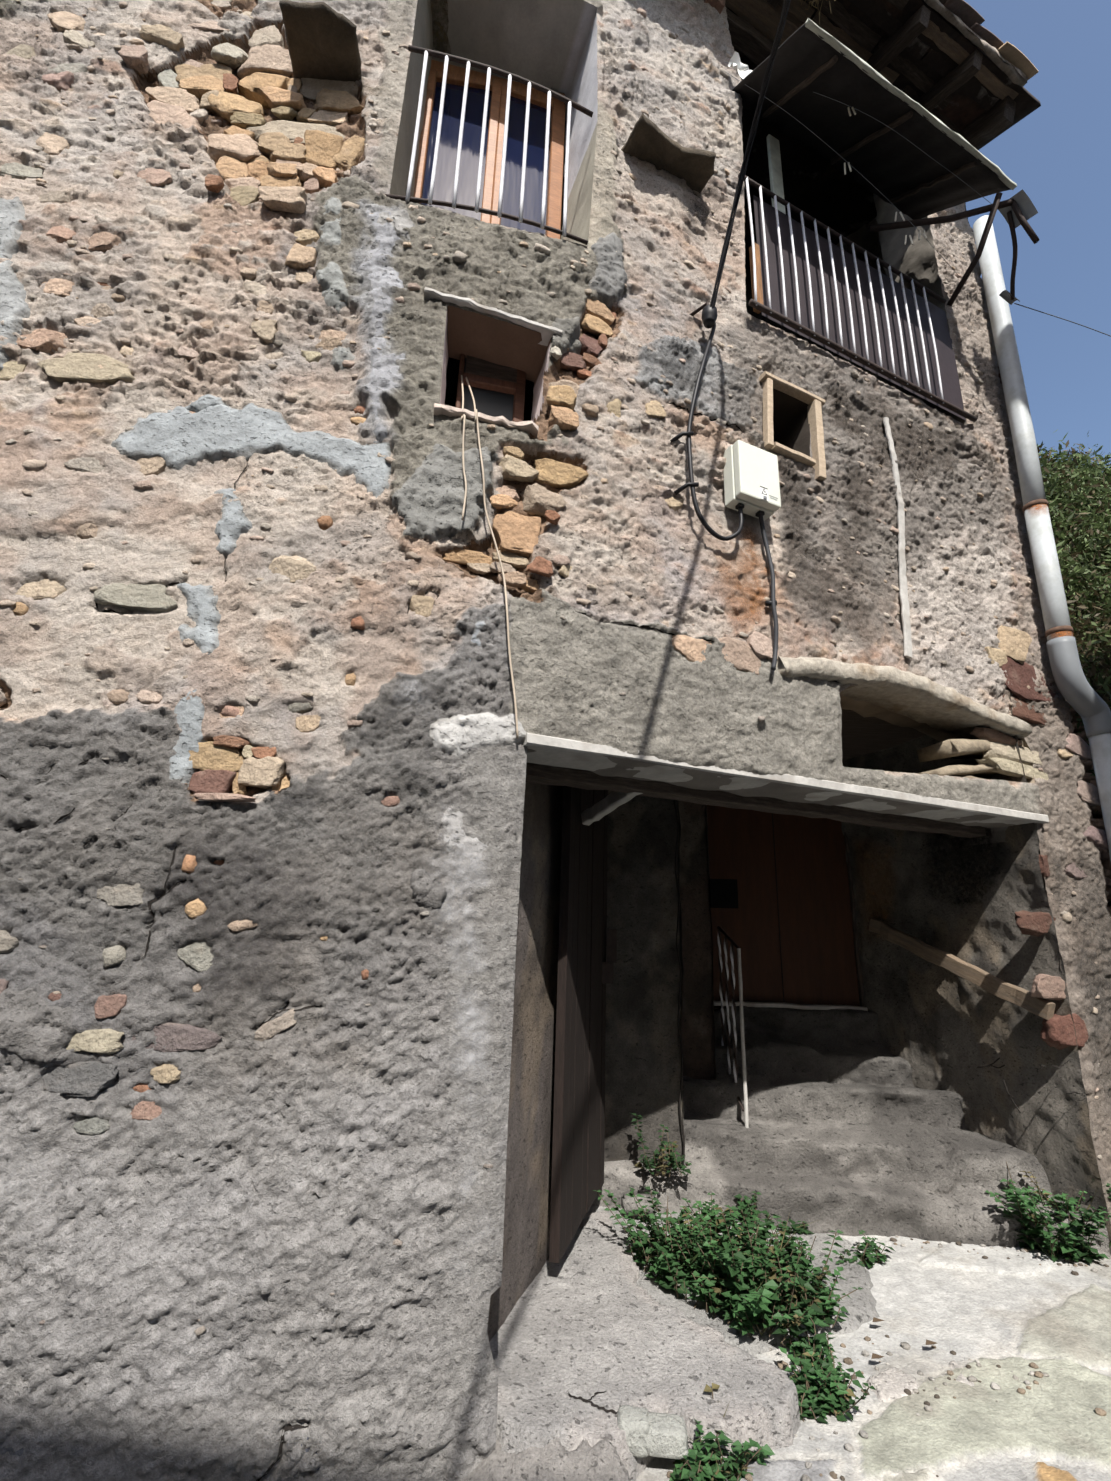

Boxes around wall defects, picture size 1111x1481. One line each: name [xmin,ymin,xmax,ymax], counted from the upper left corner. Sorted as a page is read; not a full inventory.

flaking render [118,11,366,286]
flaking render [435,299,625,603]
damp [829,389,957,478]
damp [780,456,811,592]
flaking render [0,679,12,709]
flaking render [984,625,1056,725]
crack [0,757,94,785]
flaking render [184,705,290,802]
flaking render [970,728,1092,780]
crack [16,805,132,847]
crack [141,846,187,960]
crack [256,1424,309,1481]